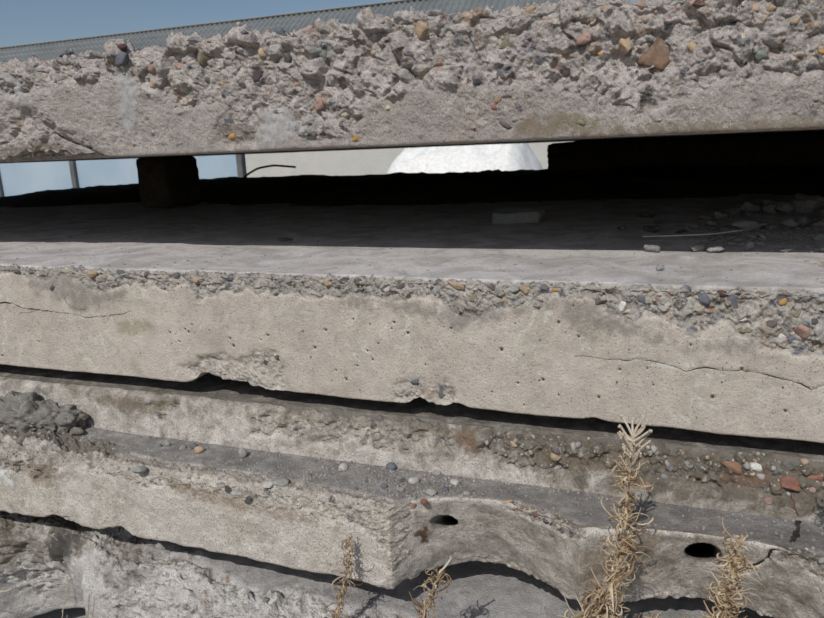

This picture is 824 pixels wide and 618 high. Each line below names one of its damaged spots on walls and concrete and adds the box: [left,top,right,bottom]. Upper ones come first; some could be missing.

spalling [0,0,824,148]
spalling [644,244,660,253]
spalling [691,243,707,252]
crack [0,302,128,318]
spalling [0,263,824,357]
spalling [181,351,286,390]
crack [583,355,824,390]
spalling [147,396,180,422]
spalling [0,424,417,579]
spalling [502,499,587,541]
crack [736,495,802,581]